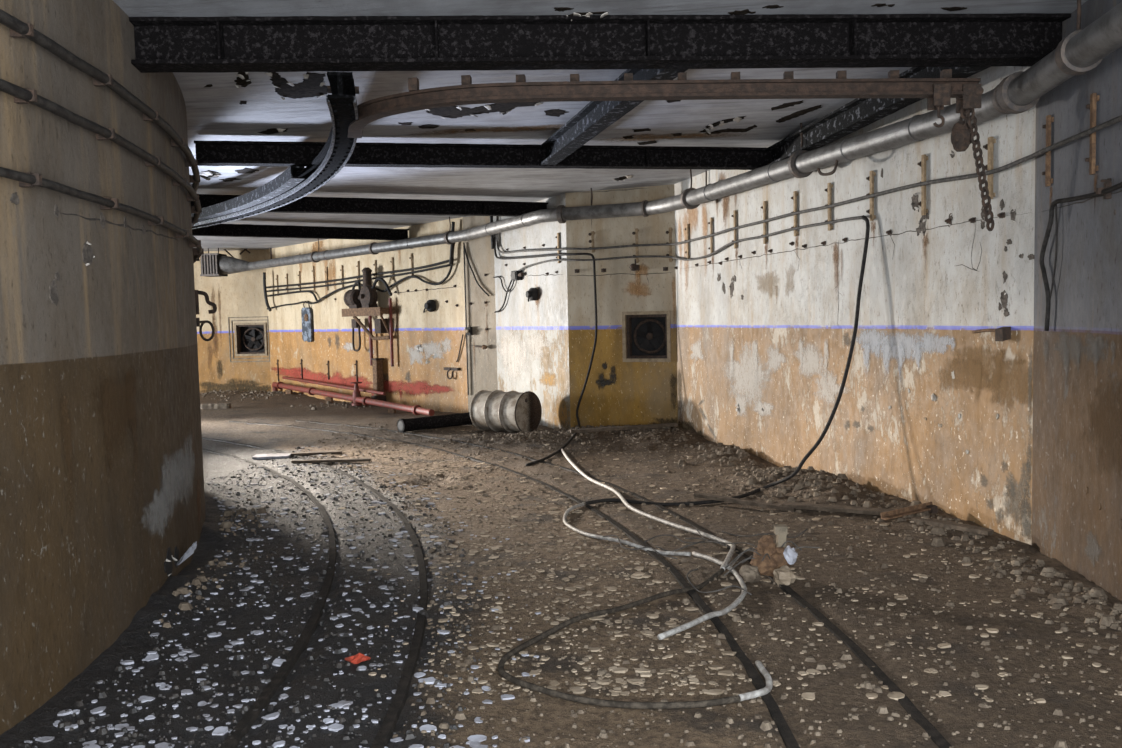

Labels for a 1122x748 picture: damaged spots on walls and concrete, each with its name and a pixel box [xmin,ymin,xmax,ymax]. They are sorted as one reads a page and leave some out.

peeling [234,72,328,105]
peeling [398,102,568,131]
peeling [409,339,451,364]